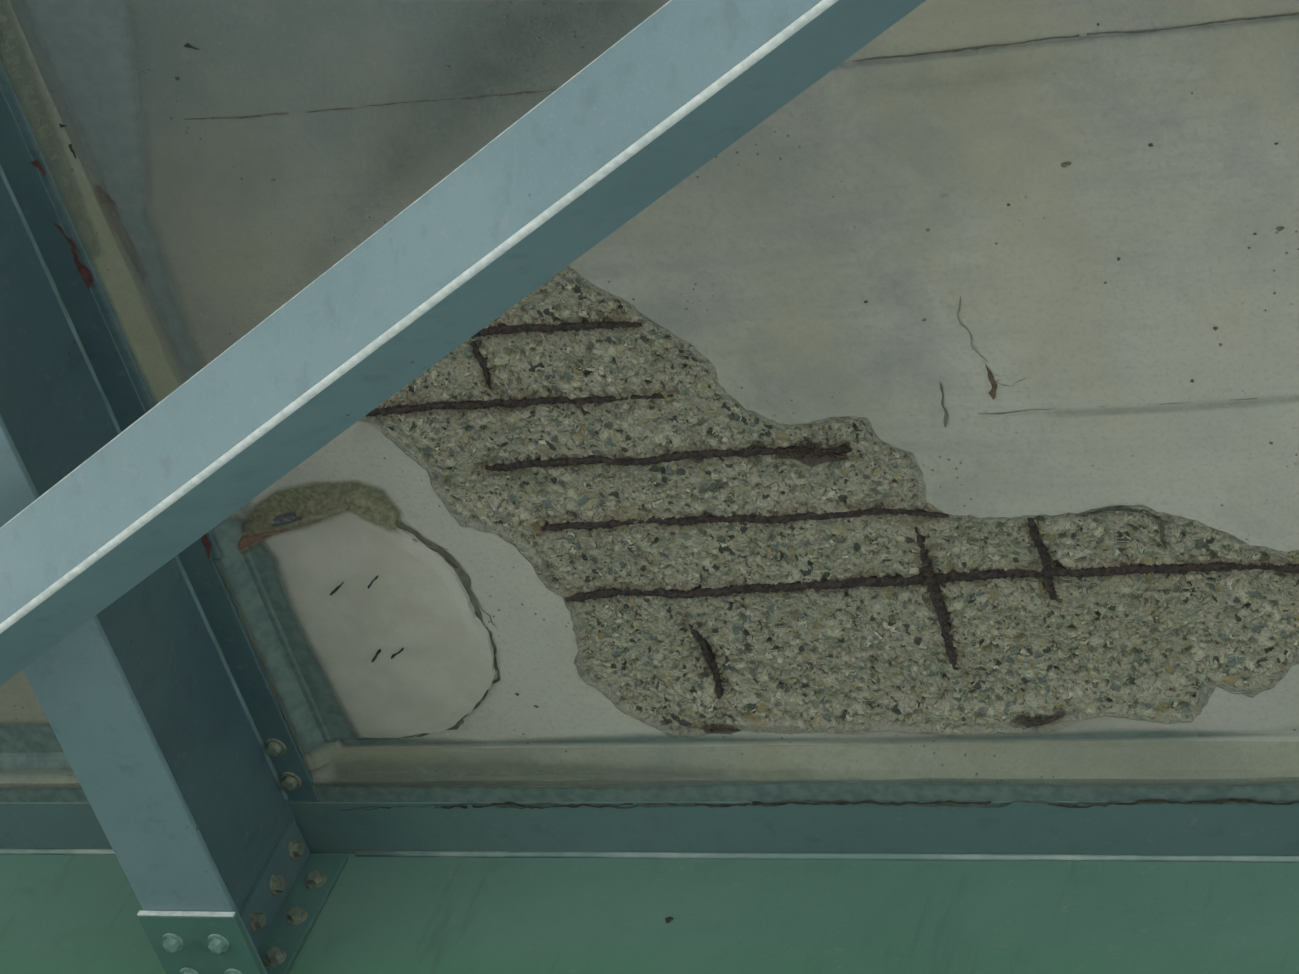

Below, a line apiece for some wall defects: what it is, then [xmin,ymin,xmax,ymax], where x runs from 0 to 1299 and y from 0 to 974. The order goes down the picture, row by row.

crack [851,12,1299,62]
crack [184,89,557,120]
crack [909,296,1050,428]
rust [774,440,848,467]
spalling [359,266,1299,738]
crack [341,798,1299,811]